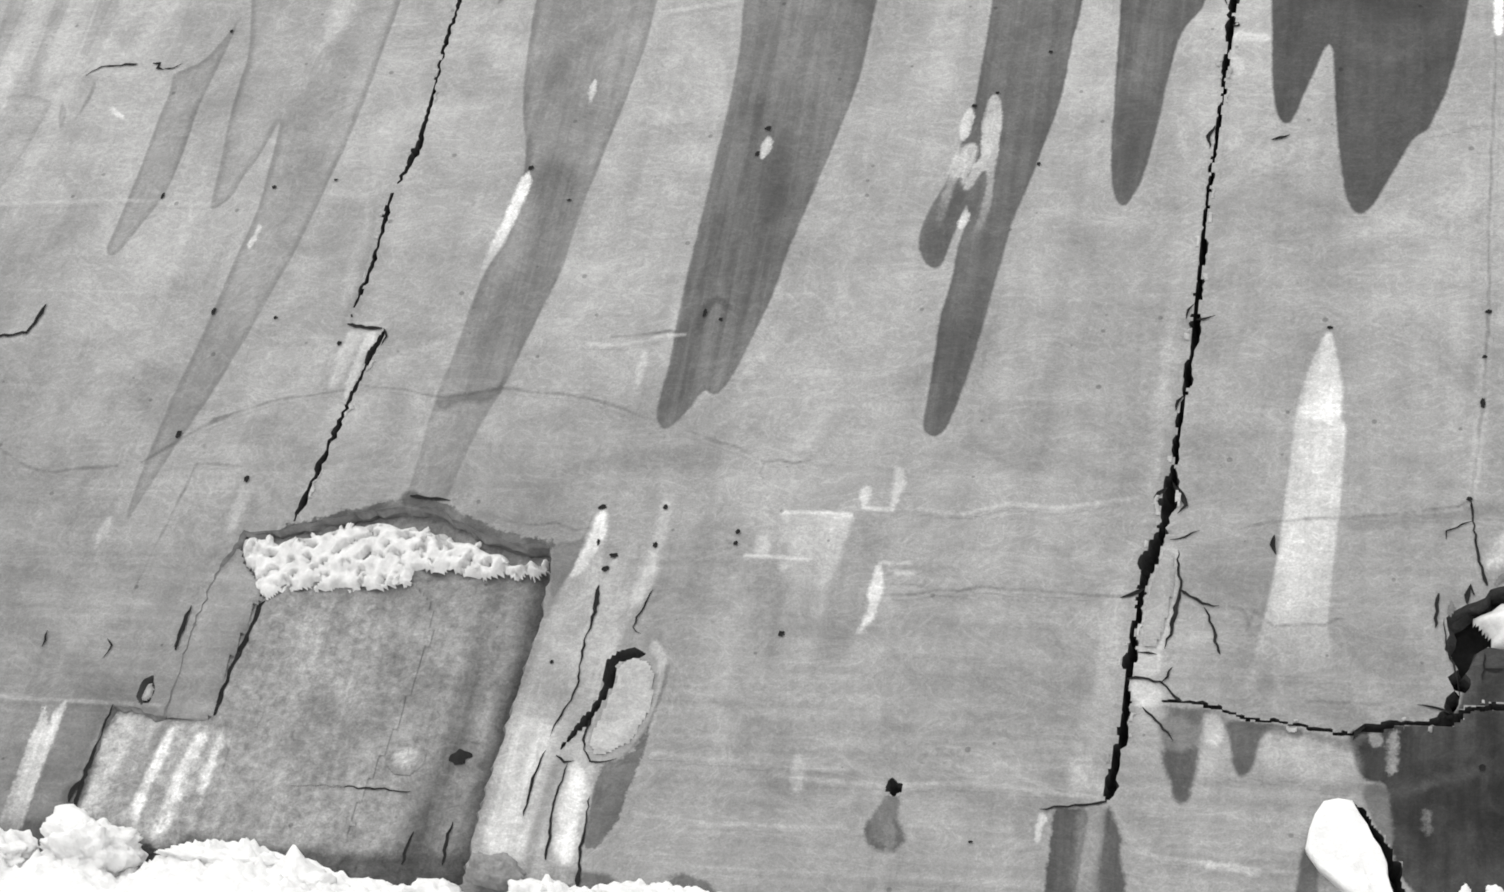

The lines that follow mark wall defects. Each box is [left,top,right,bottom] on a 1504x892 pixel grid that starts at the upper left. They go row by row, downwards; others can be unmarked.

leakage [0,0,404,555]
crack [213,601,265,716]
spalling [73,506,552,839]
crack [0,0,660,596]
leakage [321,0,456,404]
leakage [0,459,922,892]
crack [523,585,674,887]
leakage [397,0,881,497]
crack [876,0,1504,810]
leakage [895,0,1504,892]
spalling [1444,573,1504,721]